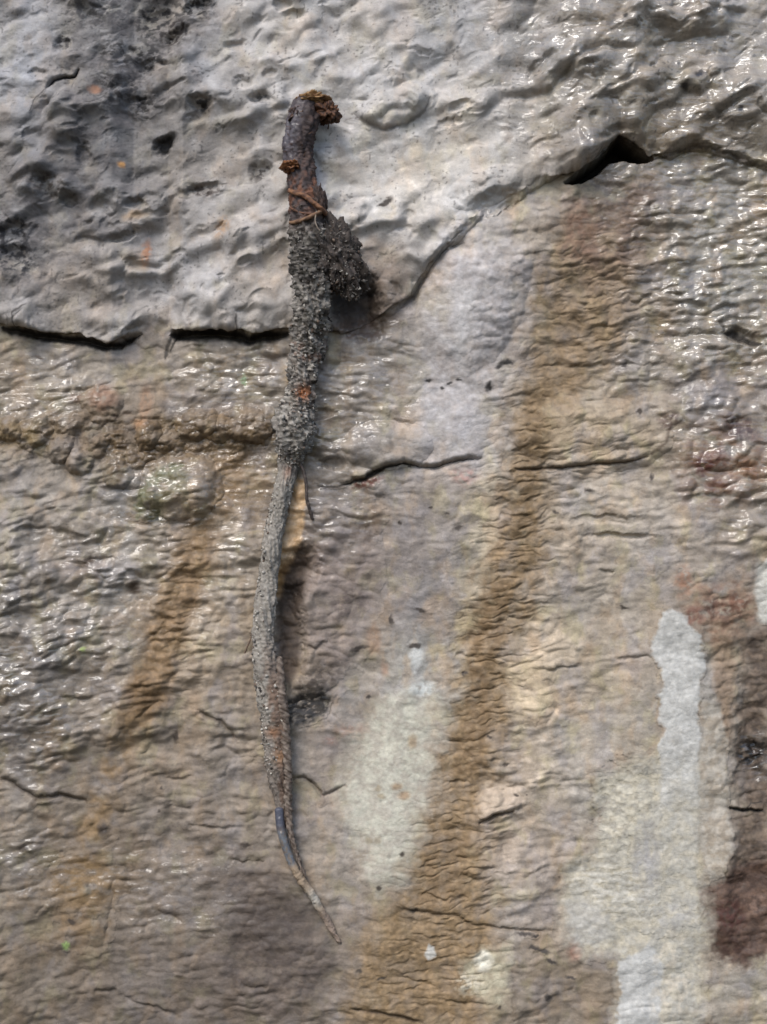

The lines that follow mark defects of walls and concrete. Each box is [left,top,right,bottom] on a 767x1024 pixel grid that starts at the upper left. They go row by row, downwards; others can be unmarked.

damp [249,91,275,103]
crack [651,139,767,169]
damp [247,159,276,185]
crack [399,230,465,311]
crack [0,303,290,361]
crack [316,469,387,490]
corrosion [347,473,387,492]
crack [412,457,483,469]
crack [514,465,565,473]
corrosion [244,89,371,944]
damp [184,163,680,1024]
damp [549,557,767,1024]